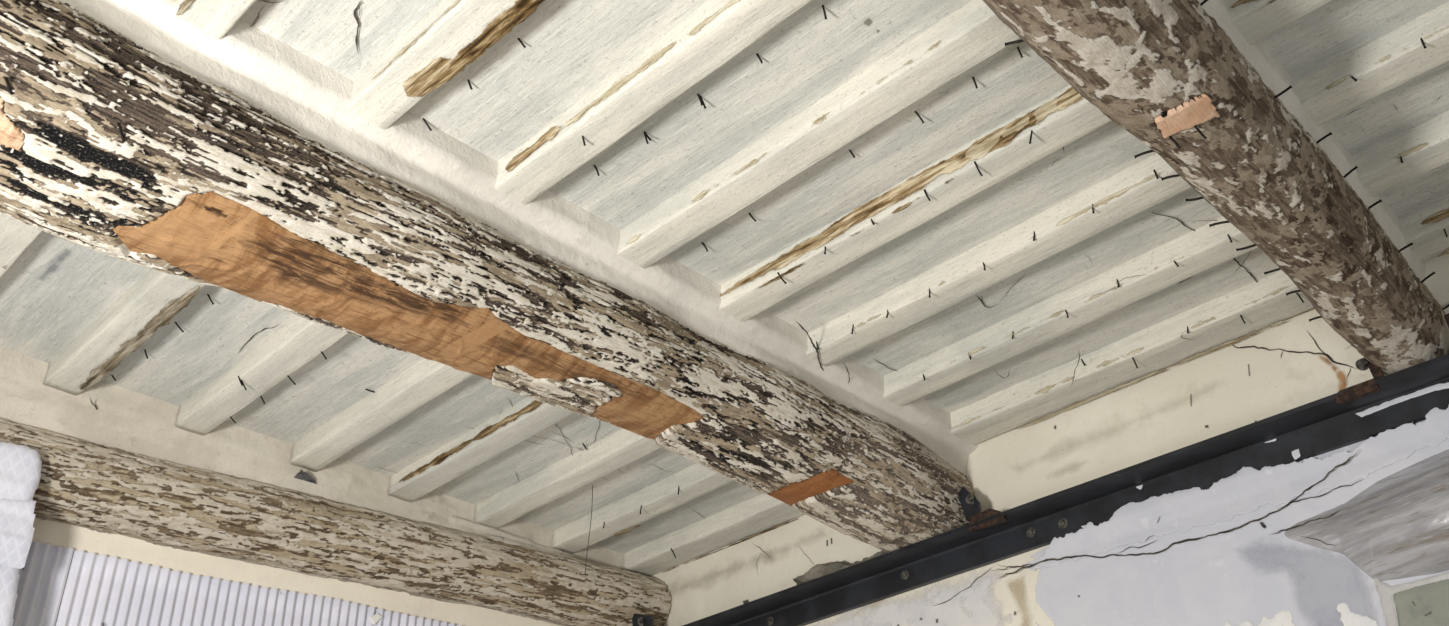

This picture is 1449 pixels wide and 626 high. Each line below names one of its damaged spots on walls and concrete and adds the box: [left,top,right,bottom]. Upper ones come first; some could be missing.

corrosion [1322,358,1346,390]
peeling [1356,382,1449,417]
crack [932,449,1361,606]
peeling [1031,438,1449,626]